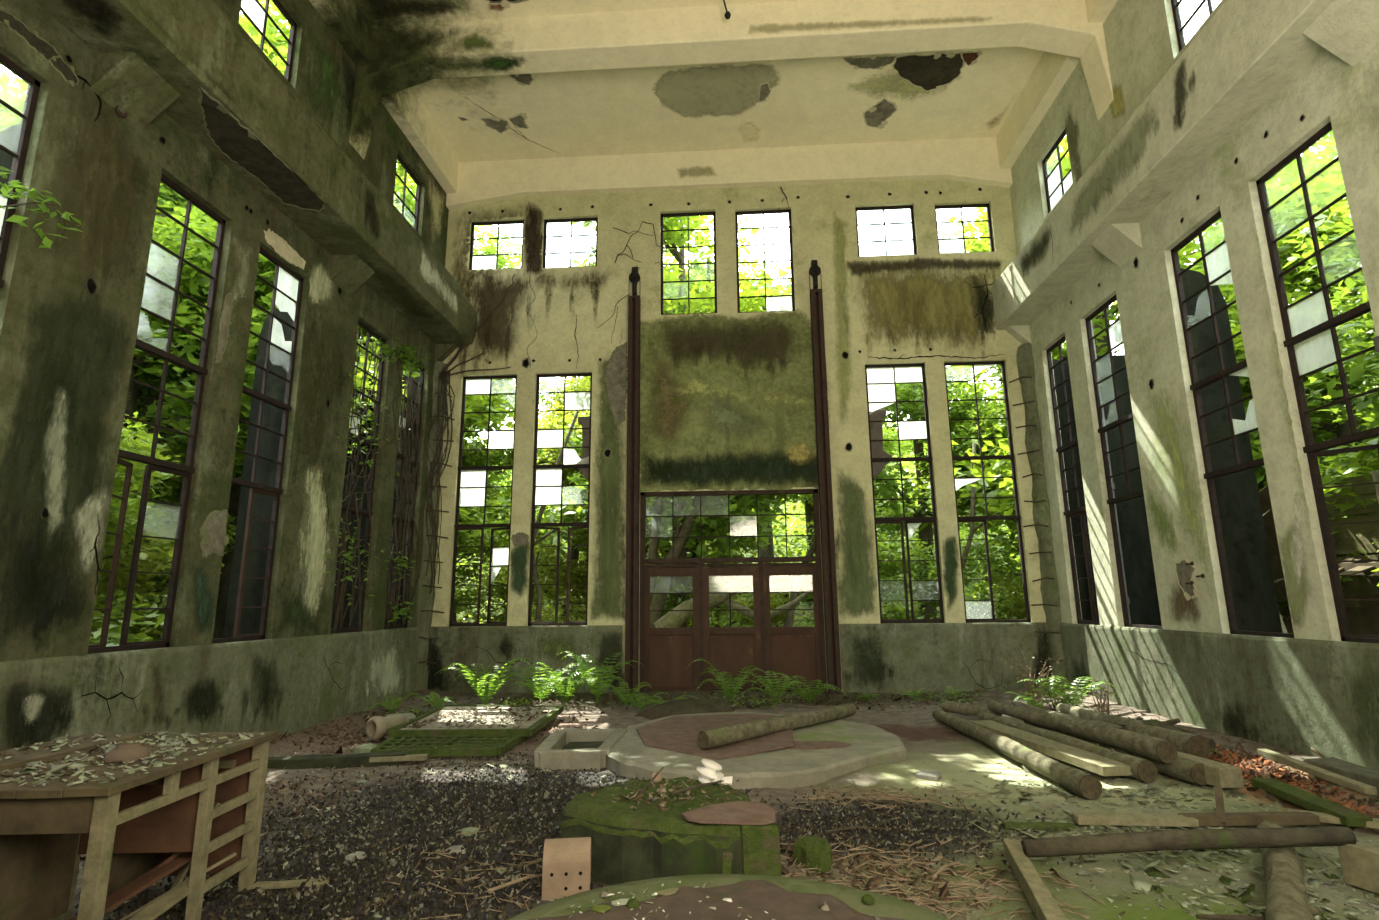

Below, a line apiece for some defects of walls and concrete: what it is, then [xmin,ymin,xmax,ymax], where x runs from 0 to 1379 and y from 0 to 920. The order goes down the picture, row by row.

damp [371,0,465,19]
damp [436,30,518,70]
spalling [843,50,982,91]
spalling [758,82,771,103]
peeling [863,98,897,129]
damp [421,207,603,359]
damp [836,220,1000,415]
damp [591,311,819,692]
crack [81,667,142,723]